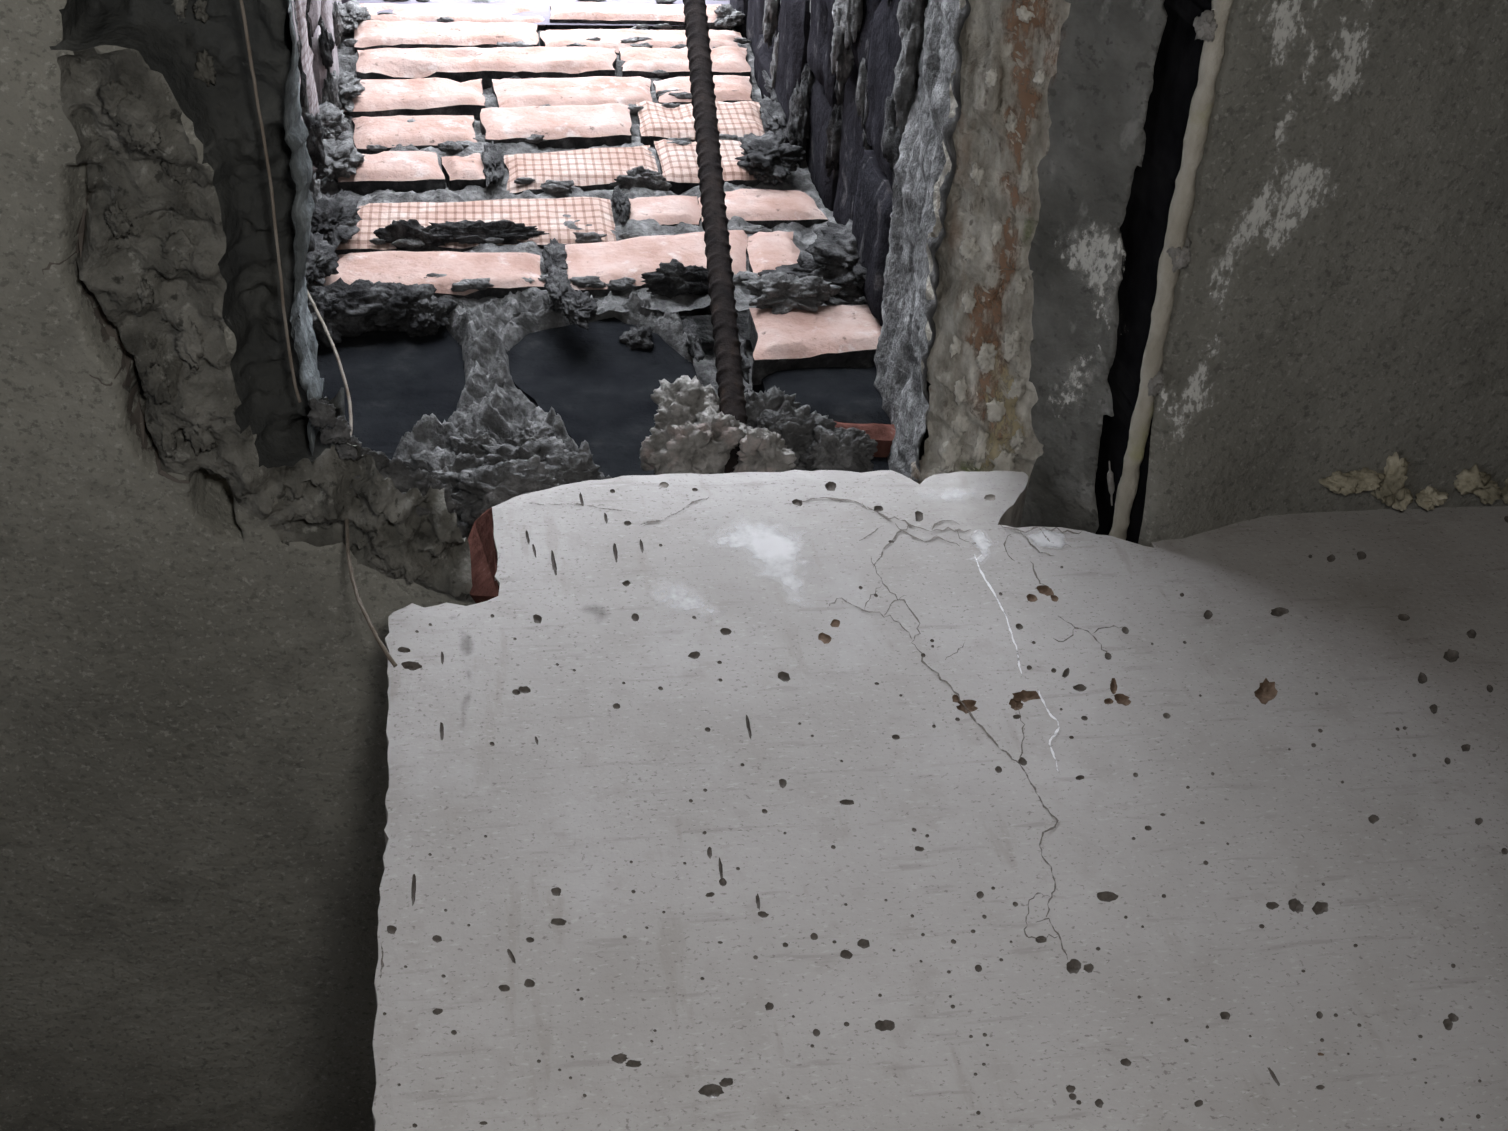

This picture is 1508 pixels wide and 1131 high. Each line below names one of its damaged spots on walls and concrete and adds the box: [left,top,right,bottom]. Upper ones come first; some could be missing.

spalling [49,0,718,604]
spalling [743,0,1071,487]
rust [965,0,1065,440]
water stain [1156,94,1337,439]
water stain [1258,0,1373,102]
crack [797,497,1124,960]